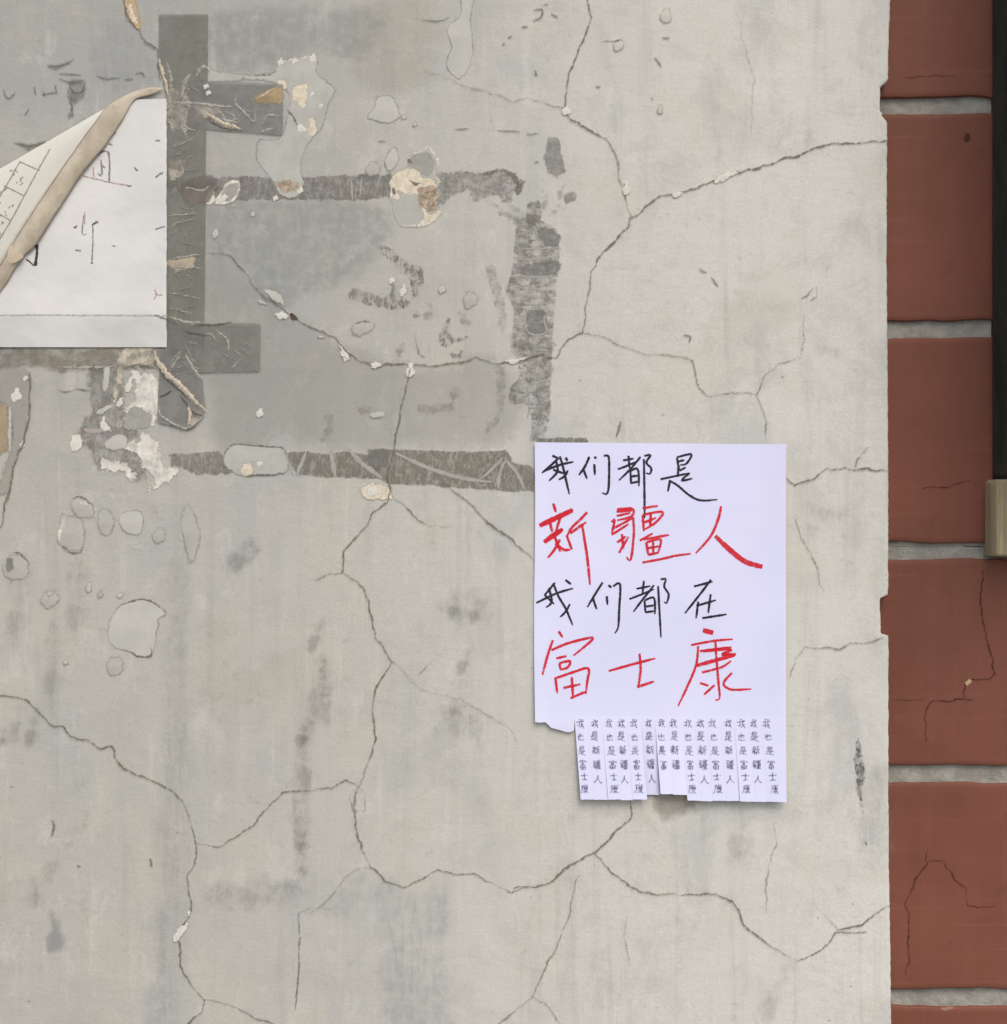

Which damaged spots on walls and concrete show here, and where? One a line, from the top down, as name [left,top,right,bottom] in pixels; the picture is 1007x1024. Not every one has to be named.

crack [139,30,161,78]
peeling [206,180,240,205]
peeling [208,53,335,201]
peeling [365,145,443,227]
peeling [257,289,290,320]
crack [0,373,31,527]
peeling [62,347,179,492]
peeling [223,443,288,477]
crack [261,0,889,757]
crack [906,578,995,710]
crack [0,695,658,1024]
crack [687,893,910,965]